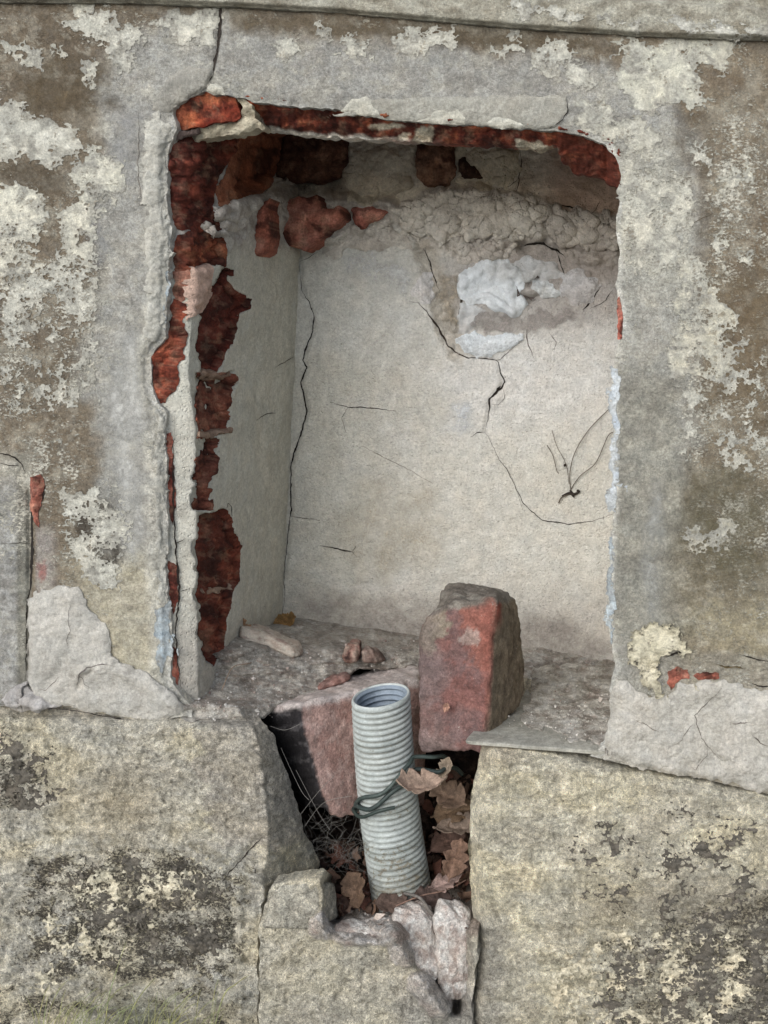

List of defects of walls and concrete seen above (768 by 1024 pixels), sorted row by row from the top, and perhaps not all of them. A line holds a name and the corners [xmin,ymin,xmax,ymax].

crack [203,8,222,91]
peeling [206,84,227,96]
peeling [341,96,379,117]
peeling [417,109,466,125]
spalling [415,144,483,188]
damp [111,336,143,437]
spalling [140,111,388,685]
crack [278,254,356,607]
crack [410,242,612,525]
peeling [604,365,627,512]
damp [75,502,141,567]
peeling [596,537,719,699]